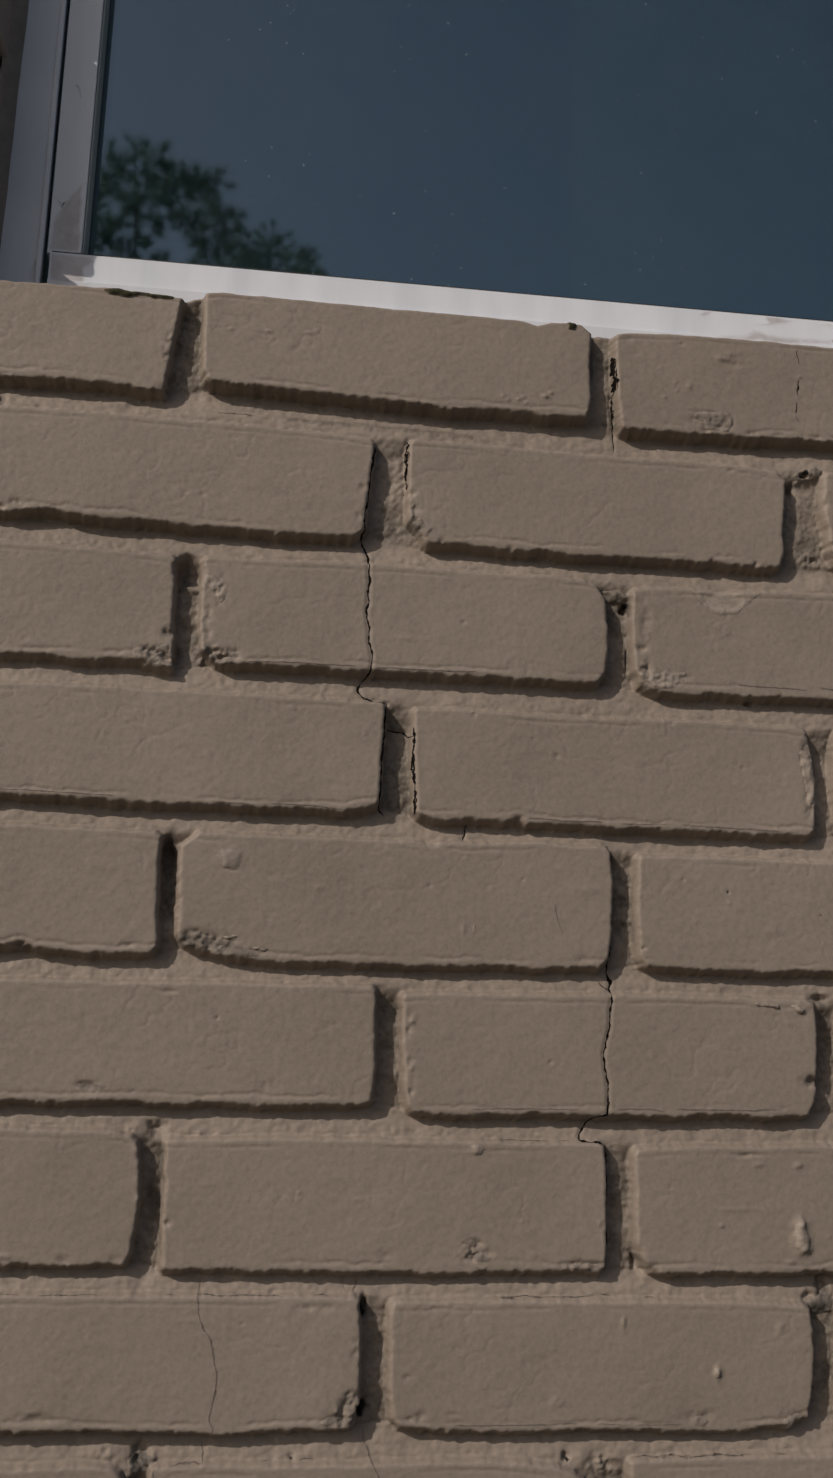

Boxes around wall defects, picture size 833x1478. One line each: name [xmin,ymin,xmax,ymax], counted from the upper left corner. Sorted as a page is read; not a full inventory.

crack [255,422,475,815]
crack [473,946,778,1300]